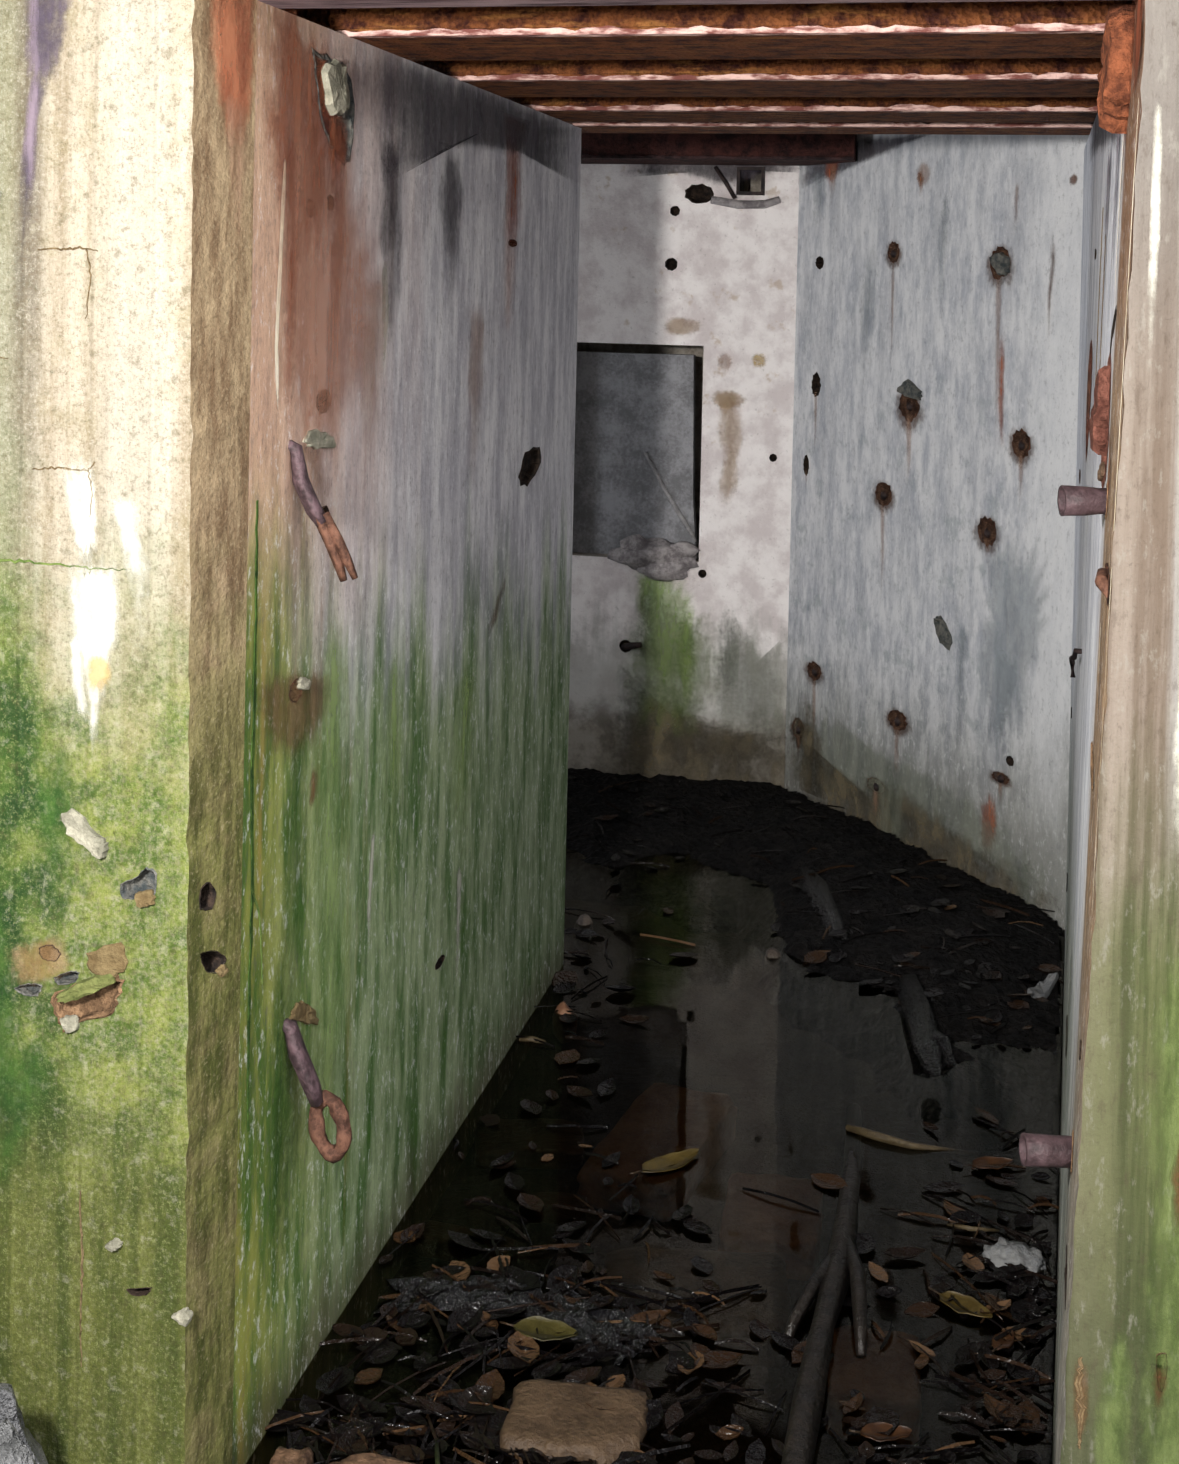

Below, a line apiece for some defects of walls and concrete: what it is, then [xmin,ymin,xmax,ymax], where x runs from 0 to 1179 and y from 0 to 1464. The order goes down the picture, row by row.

corrosion [1097,0,1142,184]
corrosion [886,244,901,267]
leakage [1104,99,1139,523]
corrosion [897,395,921,427]
corrosion [999,354,1031,463]
corrosion [875,484,893,510]
corrosion [977,520,998,551]
leakage [66,466,144,726]
leakage [616,700,785,788]
corrosion [887,711,907,735]
leakage [802,707,1023,898]
spalling [14,942,129,1034]